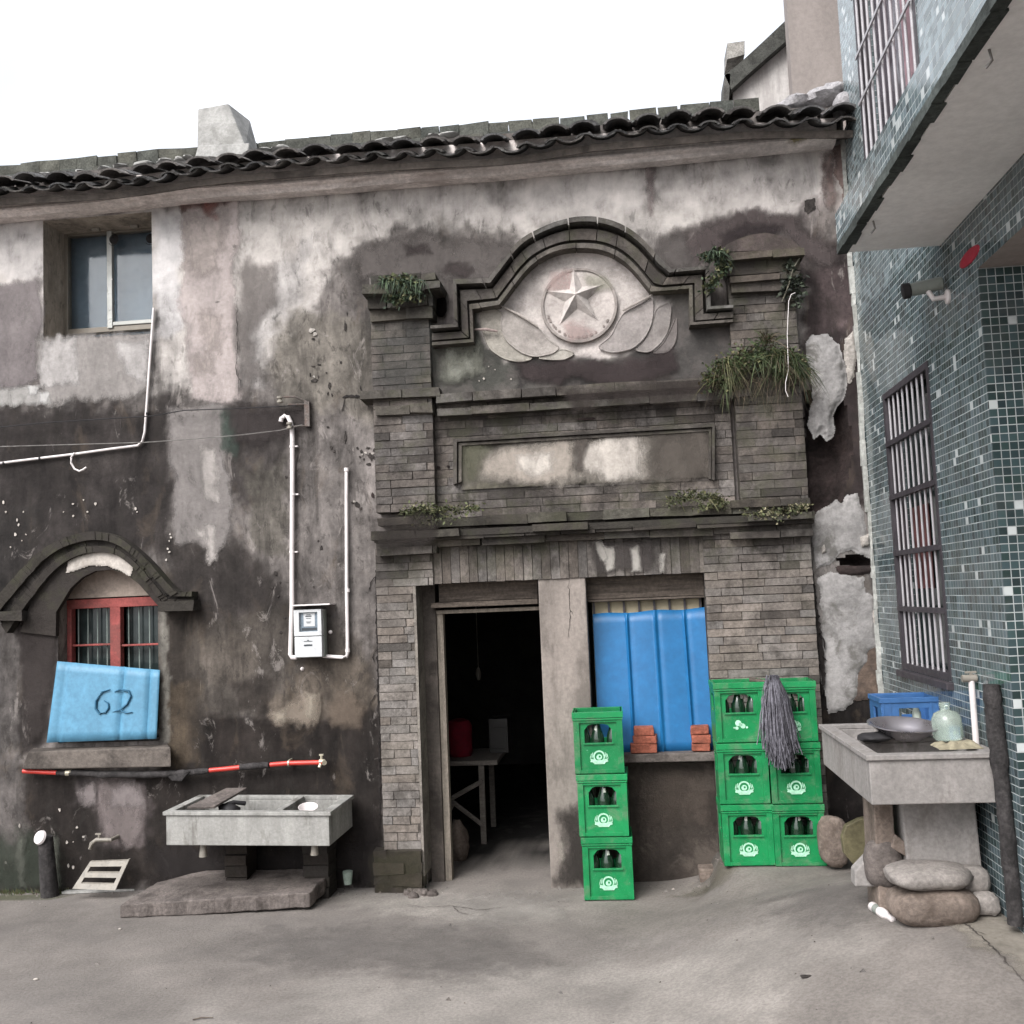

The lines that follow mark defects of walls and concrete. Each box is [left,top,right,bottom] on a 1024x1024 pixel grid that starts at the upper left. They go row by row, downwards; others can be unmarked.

water stain [822,151,837,205]
water stain [168,201,305,564]
water stain [477,428,712,487]
peeling [803,390,875,714]
water stain [271,695,362,726]
water stain [77,779,144,848]
water stain [147,841,227,880]
water stain [256,846,304,870]
water stain [336,818,383,888]